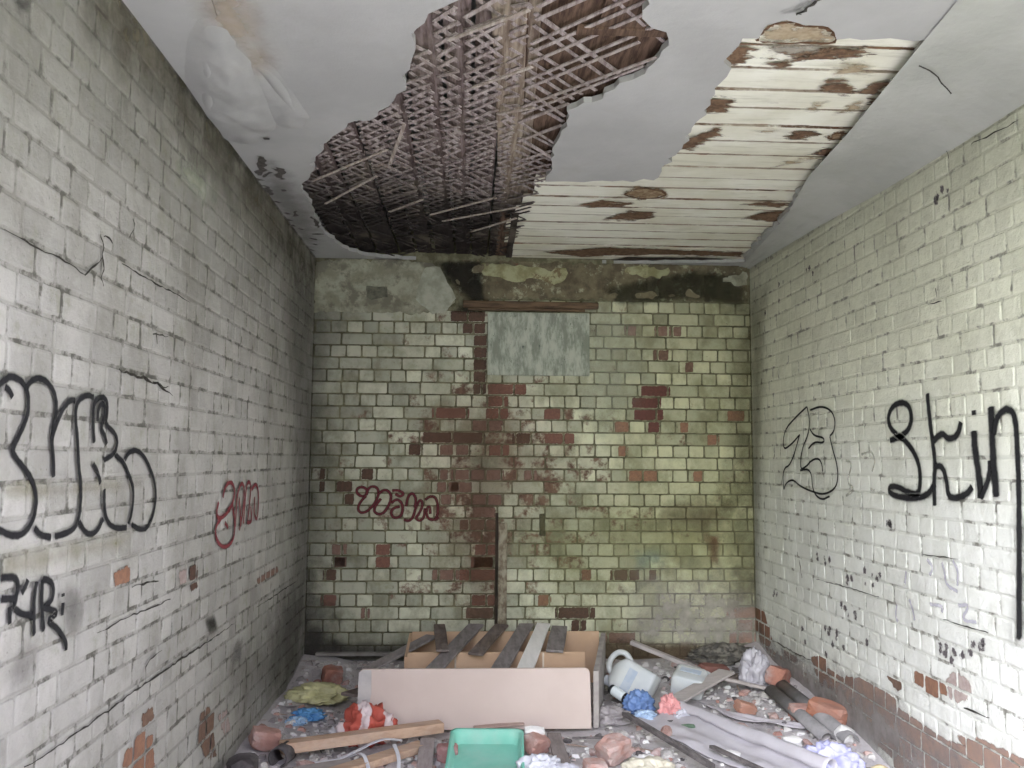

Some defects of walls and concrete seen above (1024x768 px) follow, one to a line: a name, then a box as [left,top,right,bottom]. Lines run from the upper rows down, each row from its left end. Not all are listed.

peeling [726,21,889,113]
crack [919,65,952,94]
peeling [706,96,737,114]
damp [91,0,312,269]
peeling [682,127,722,153]
peeling [777,131,847,167]
peeling [578,186,668,221]
peeling [740,201,789,222]
crack [4,220,189,302]
damp [609,272,742,303]
crack [24,622,236,768]
flaking render [802,626,1024,768]